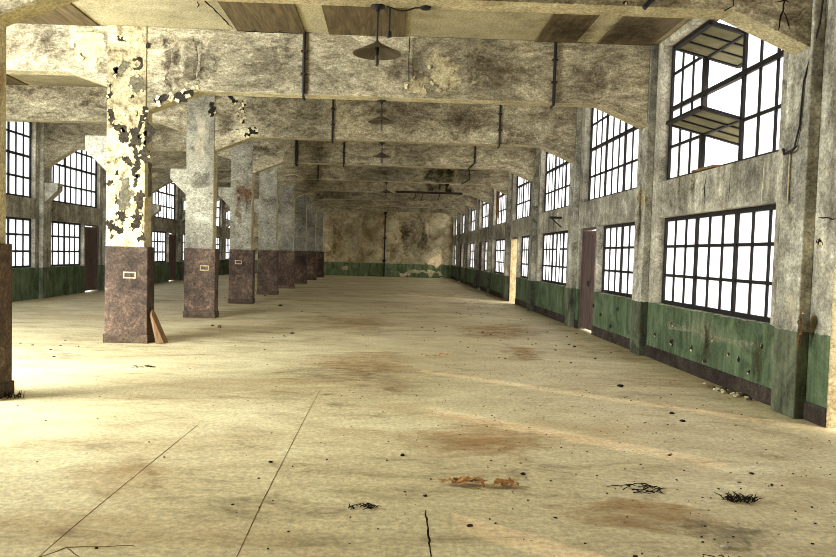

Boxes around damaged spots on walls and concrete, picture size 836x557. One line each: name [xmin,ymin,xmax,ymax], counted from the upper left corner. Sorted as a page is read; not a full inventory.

flaking render [68,27,106,73]
spalling [228,96,259,138]
flaking render [105,57,199,242]
flaking render [397,247,444,277]